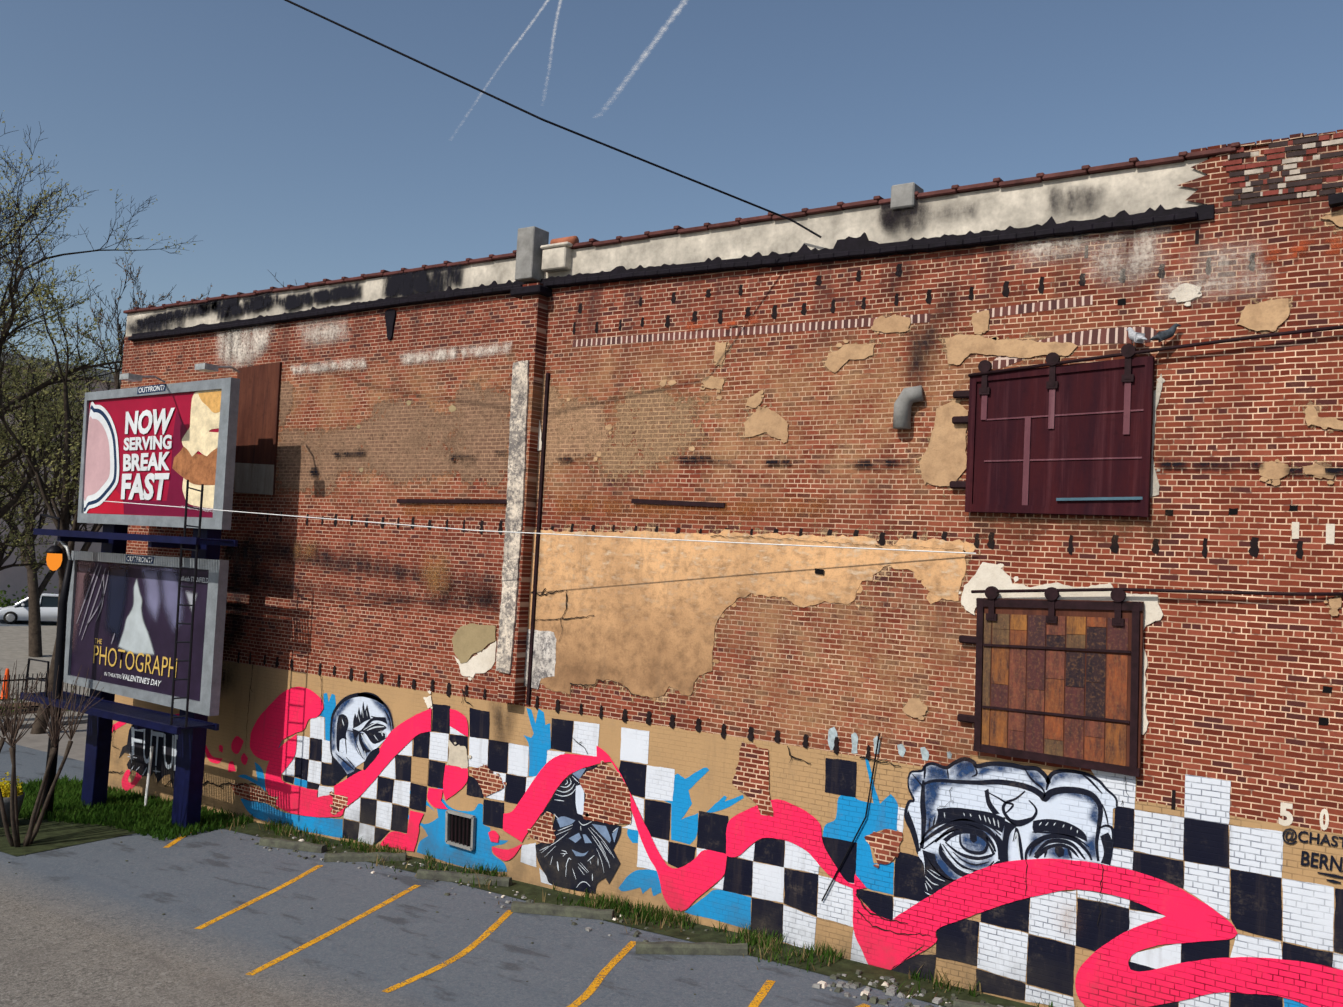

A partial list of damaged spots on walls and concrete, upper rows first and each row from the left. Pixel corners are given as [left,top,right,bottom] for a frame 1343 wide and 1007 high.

water stain [383,265,461,297]
water stain [127,282,359,363]
water stain [293,360,366,373]
water stain [404,344,508,362]
peeling [963,541,976,557]
peeling [914,573,942,604]
flaking render [453,641,497,681]
peeling [524,629,556,690]
spalling [579,761,631,825]
spalling [732,742,773,816]